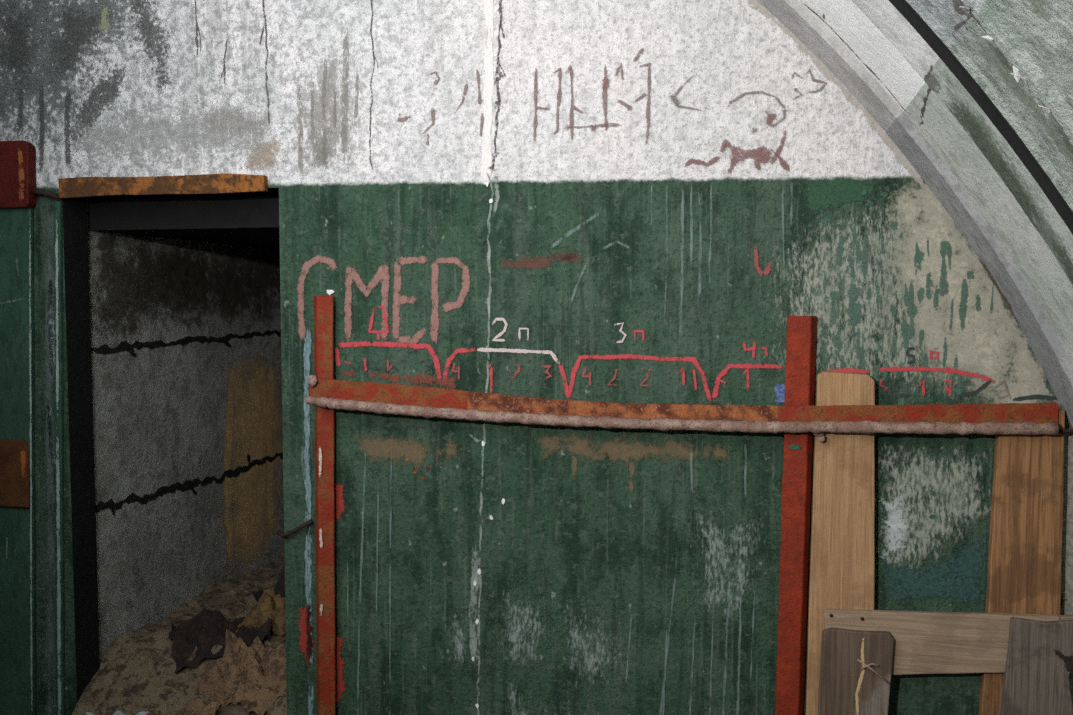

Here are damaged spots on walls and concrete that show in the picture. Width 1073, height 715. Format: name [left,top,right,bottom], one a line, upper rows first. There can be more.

damp [0,0,270,171]
crack [260,0,270,124]
damp [297,33,359,173]
crack [481,0,506,184]
corrosion [356,434,457,480]
corrosion [539,434,727,491]
peeling [774,178,1073,615]
damp [700,522,747,612]